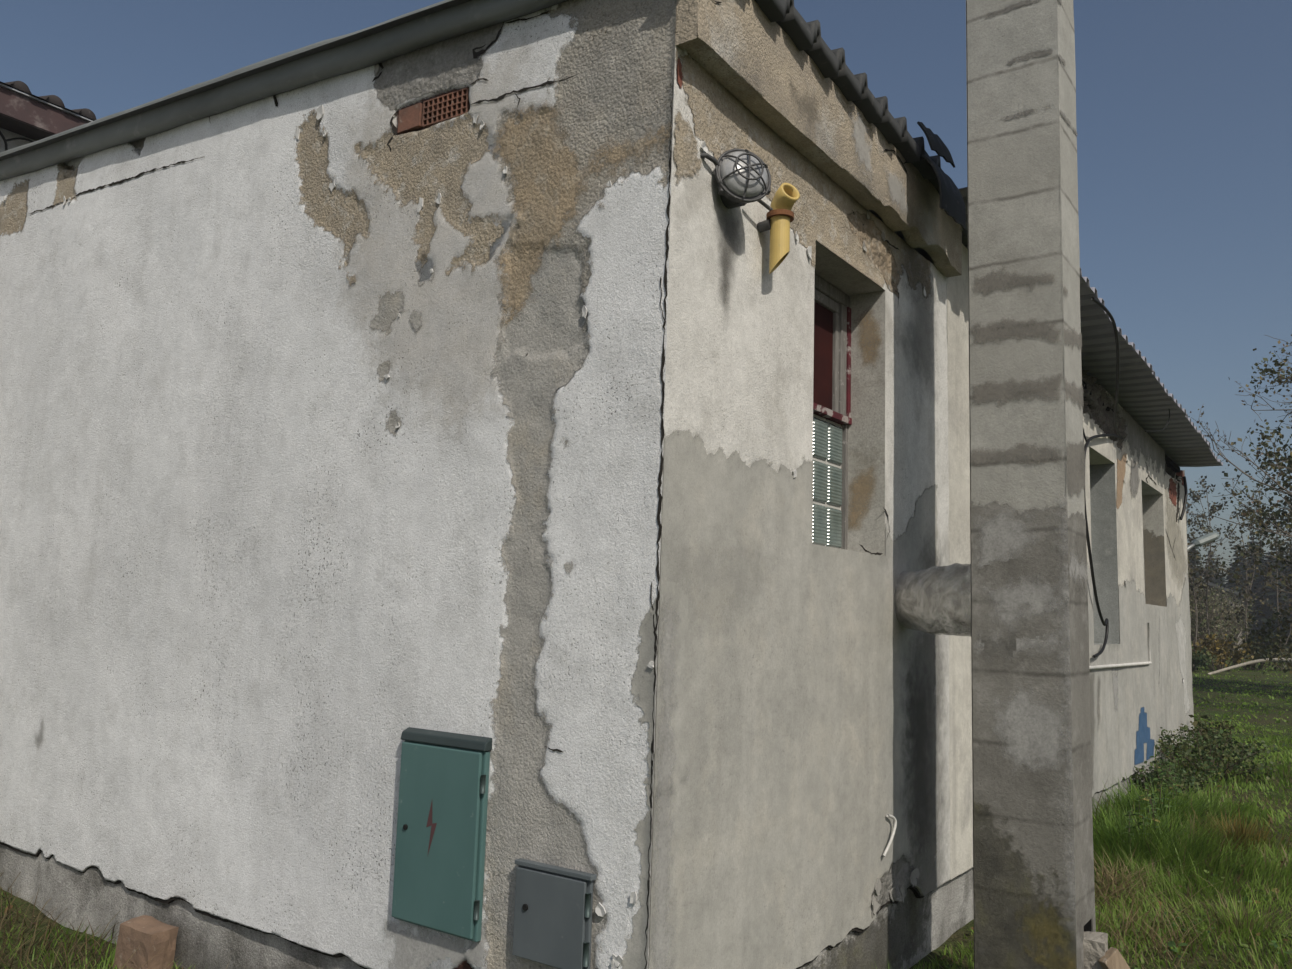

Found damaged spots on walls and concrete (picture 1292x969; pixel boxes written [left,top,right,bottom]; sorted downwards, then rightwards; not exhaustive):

crack [469,11,578,107]
peeling [0,179,29,236]
crack [29,157,203,214]
peeling [294,105,370,286]
water stain [971,319,1082,348]
water stain [972,374,1084,408]
peeling [354,0,938,969]
flaking render [1082,370,1128,509]
water stain [970,435,1096,969]
crack [0,842,368,969]
water stain [806,890,929,969]
crack [796,874,962,969]